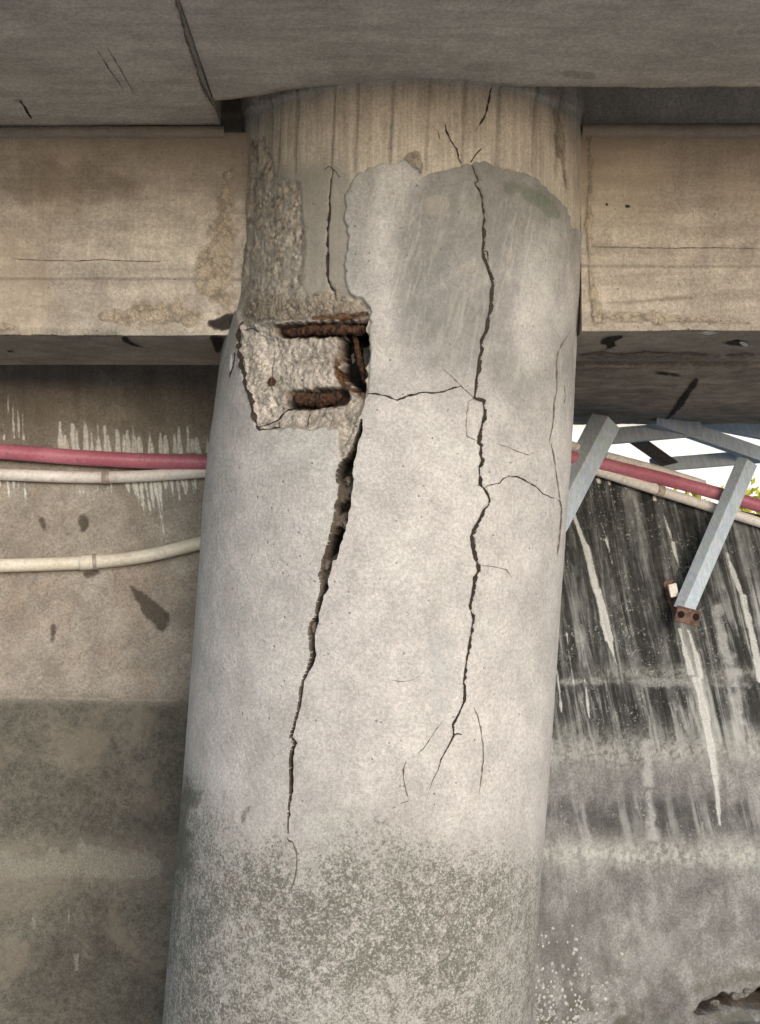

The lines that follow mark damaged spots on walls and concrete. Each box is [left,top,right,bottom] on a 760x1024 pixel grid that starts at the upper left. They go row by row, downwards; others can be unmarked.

crack [326,166,340,295]
damp [58,421,209,454]
damp [125,479,196,533]
spalling [98,171,371,459]
corrosion [312,312,368,321]
corrosion [335,358,364,396]
crack [367,86,568,809]
damp [131,586,169,632]
crack [287,419,363,888]
damp [574,515,614,656]
damp [727,553,760,682]
damp [678,628,721,825]